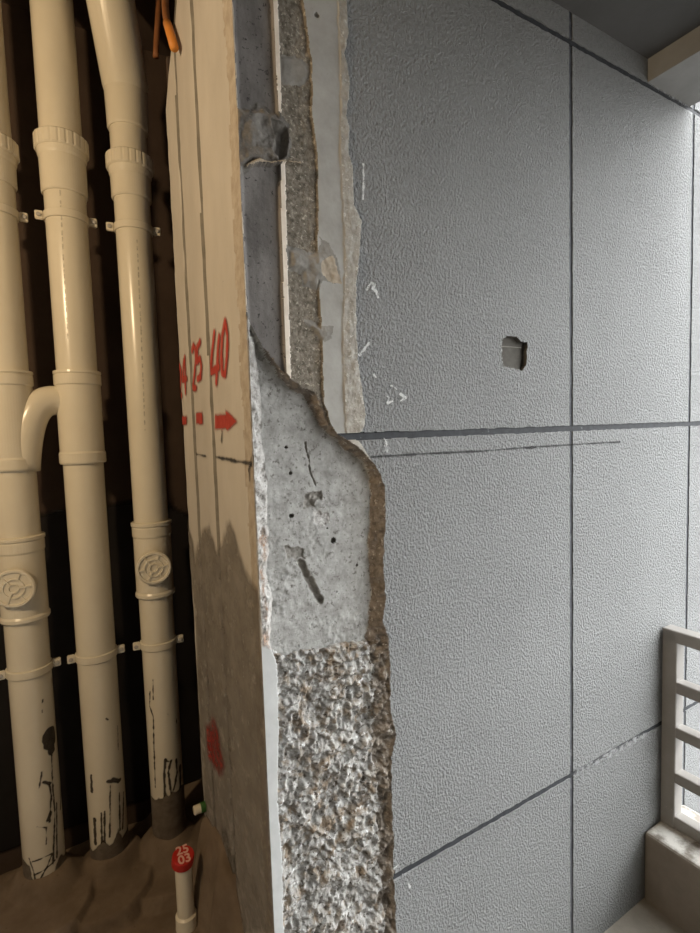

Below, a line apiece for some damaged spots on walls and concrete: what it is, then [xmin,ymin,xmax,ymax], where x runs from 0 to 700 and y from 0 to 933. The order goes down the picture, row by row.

peeling [232,0,397,933]
spalling [501,336,528,371]